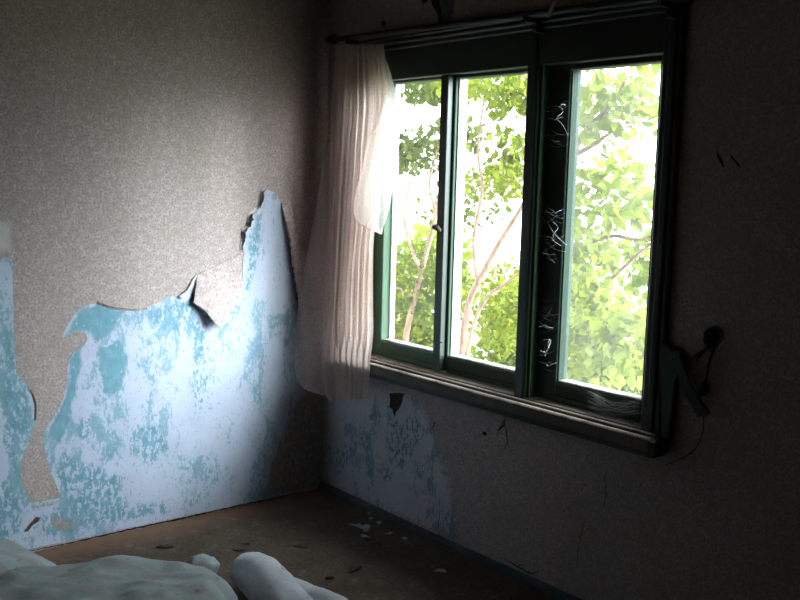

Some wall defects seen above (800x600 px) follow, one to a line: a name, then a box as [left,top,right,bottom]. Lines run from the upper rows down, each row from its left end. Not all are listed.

peeling [0,254,41,549]
peeling [322,378,461,541]